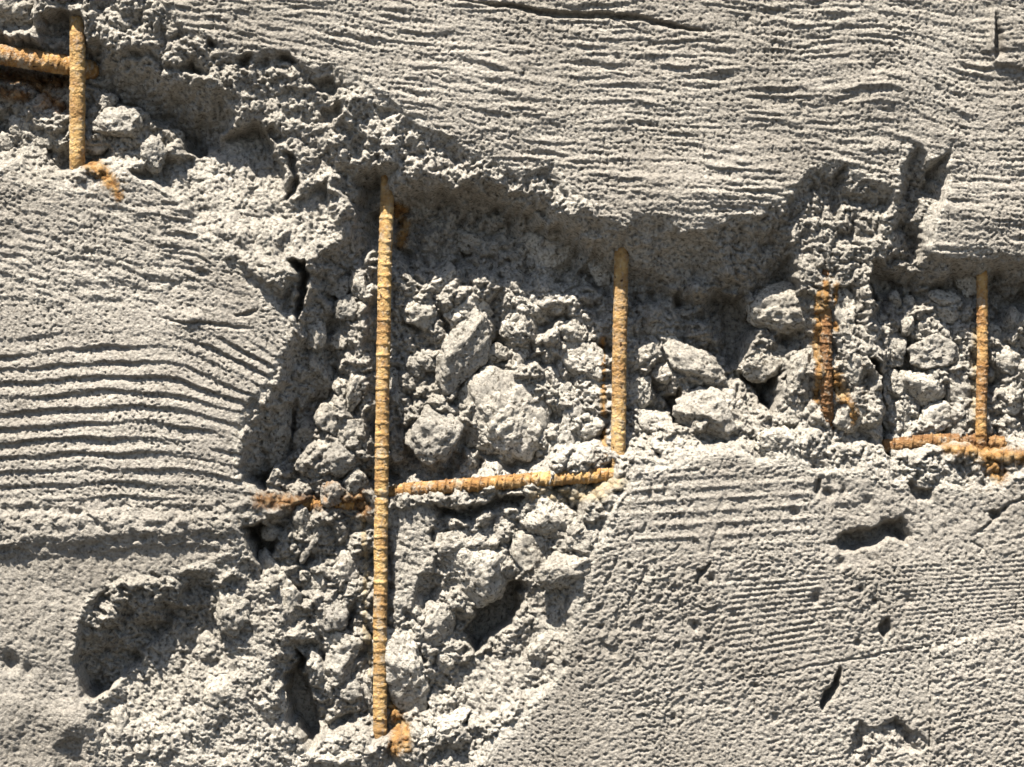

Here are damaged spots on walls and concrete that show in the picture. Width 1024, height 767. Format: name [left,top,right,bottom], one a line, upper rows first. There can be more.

corrosion [0,68,69,112]
spalling [0,0,256,199]
crack [452,0,716,42]
corrosion [84,159,124,201]
spalling [869,140,954,287]
spalling [69,28,894,767]
spalling [852,242,1024,455]
corrosion [941,326,1024,482]
corrosion [254,489,372,676]
corrosion [527,477,627,502]
hole [820,509,916,557]
crack [686,643,937,767]